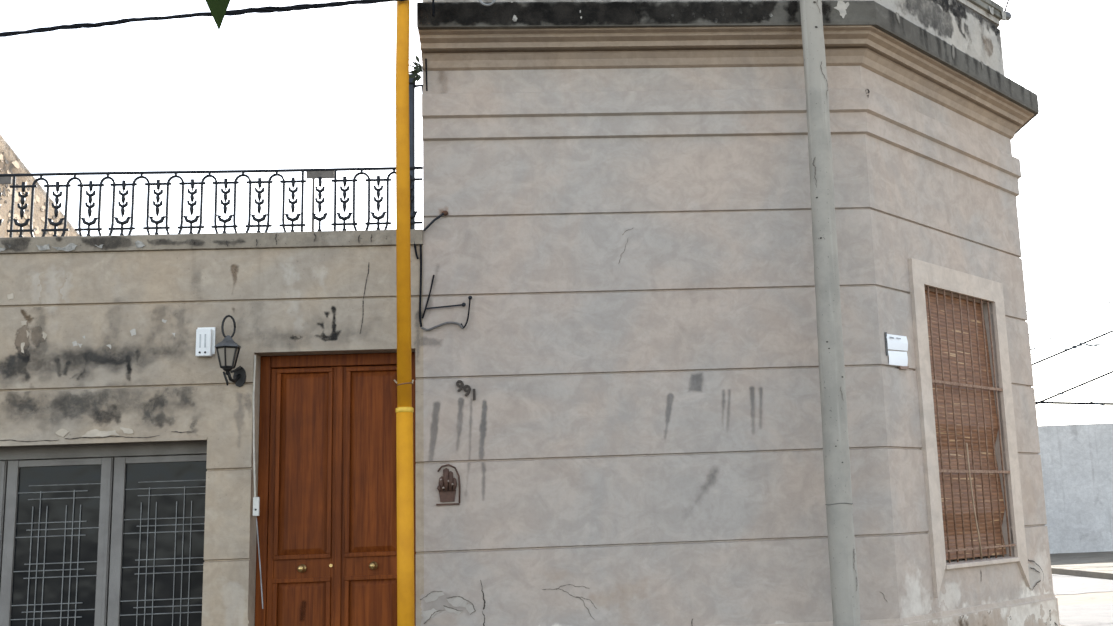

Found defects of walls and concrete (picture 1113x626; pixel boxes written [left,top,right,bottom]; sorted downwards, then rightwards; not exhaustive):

leakage [417,1,798,25]
leakage [896,0,999,76]
peeling [0,137,79,252]
leakage [3,238,29,250]
leakage [67,221,127,249]
leakage [25,262,76,339]
leakage [277,255,340,341]
leakage [3,356,29,380]
leakage [81,351,138,379]
crack [420,580,485,626]
crack [542,584,597,620]